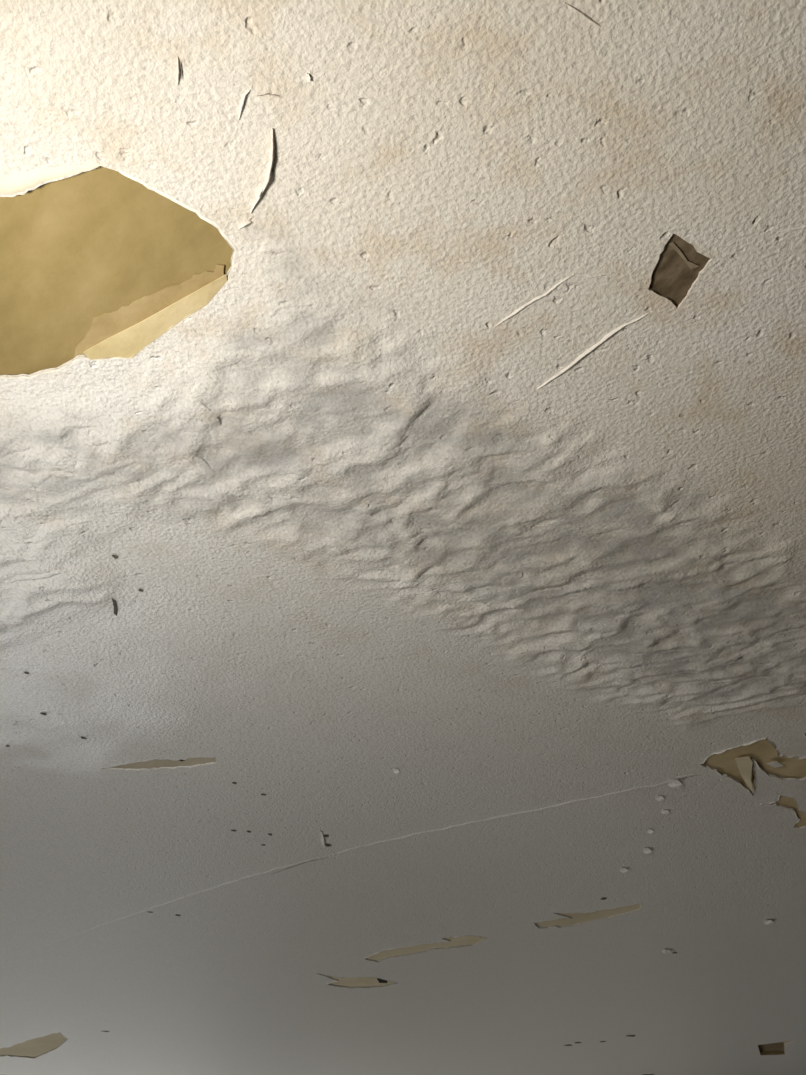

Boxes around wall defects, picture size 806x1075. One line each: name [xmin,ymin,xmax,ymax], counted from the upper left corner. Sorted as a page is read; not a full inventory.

crack [238,90,280,120]
crack [239,128,275,229]
peeling [0,160,236,379]
spalling [649,233,711,306]
crack [493,273,607,328]
crack [537,313,649,389]
peeling [100,756,217,771]
peeling [698,737,806,829]
peeling [532,898,643,929]
peeling [316,973,398,988]
peeling [0,1032,69,1058]